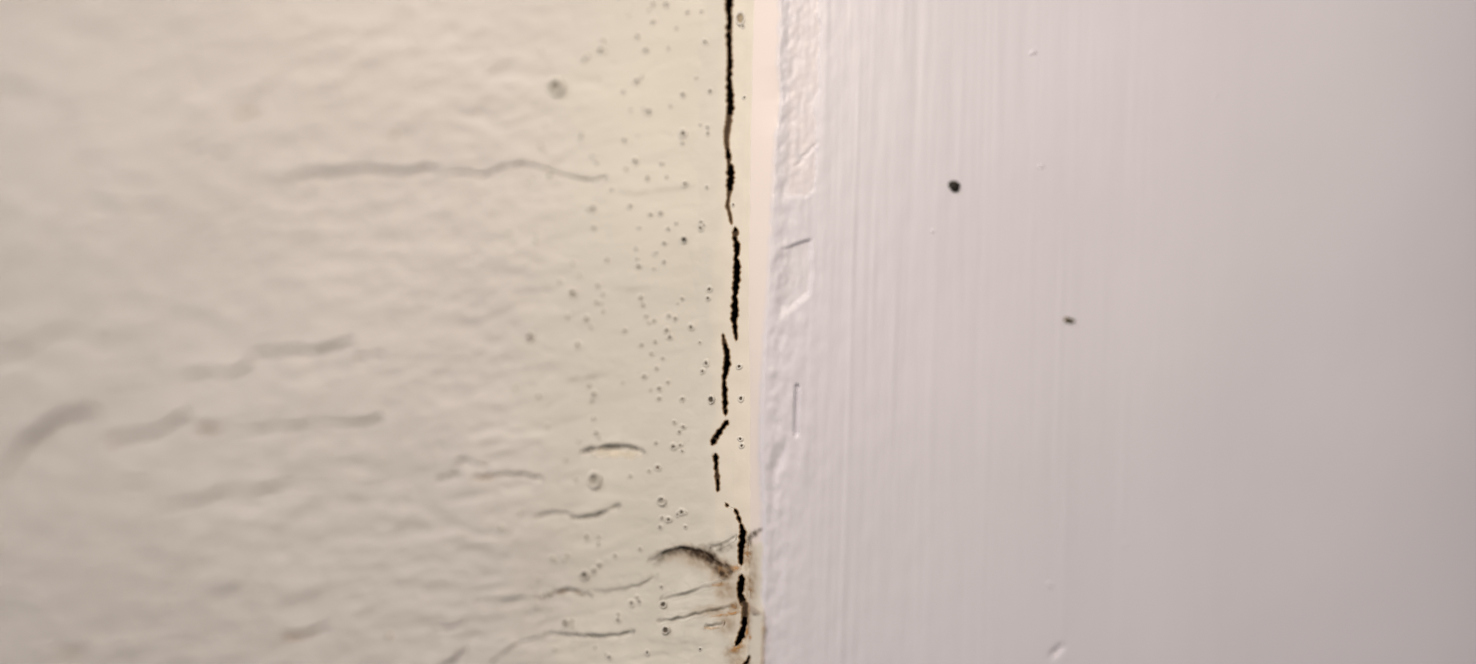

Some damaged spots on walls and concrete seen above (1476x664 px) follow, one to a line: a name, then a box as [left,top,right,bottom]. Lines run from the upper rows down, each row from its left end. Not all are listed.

crack [293,159,606,186]
crack [437,0,752,664]
crack [107,337,382,444]
crack [159,479,323,511]
corrosion [662,529,761,593]